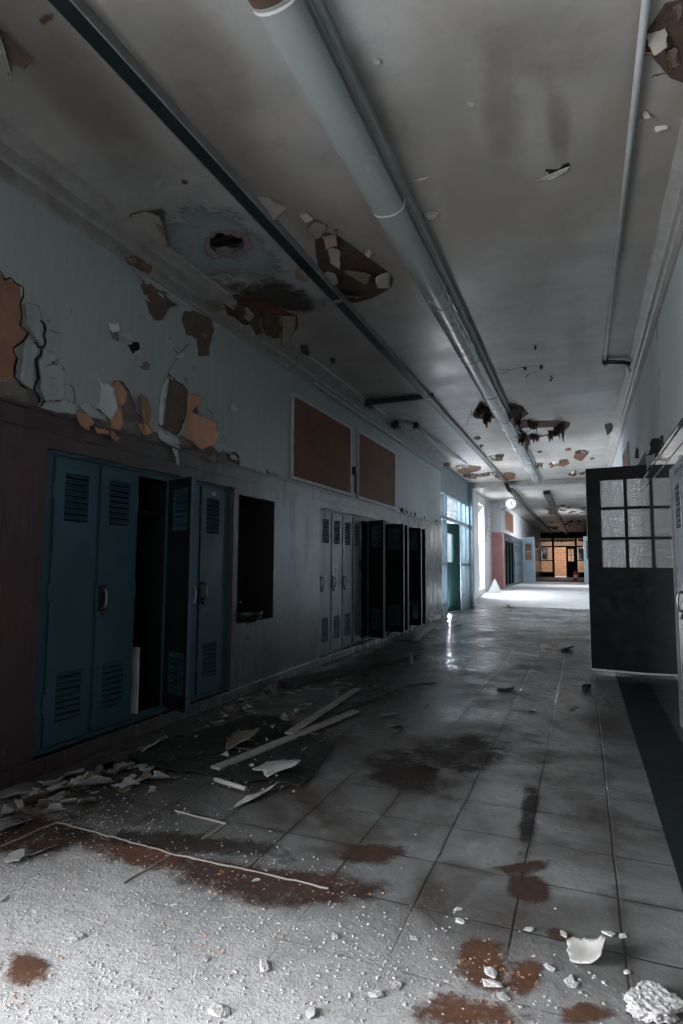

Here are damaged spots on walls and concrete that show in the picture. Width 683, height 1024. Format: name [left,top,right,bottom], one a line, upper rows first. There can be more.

peeling [644,0,683,83]
peeling [124,256,310,358]
leakage [167,205,314,312]
peeling [315,228,393,303]
flaking render [0,271,240,467]
peeling [508,403,595,476]
rust [0,812,383,909]
rust [333,844,404,863]
rust [494,860,549,903]
rust [6,952,50,986]
rust [413,939,543,1024]